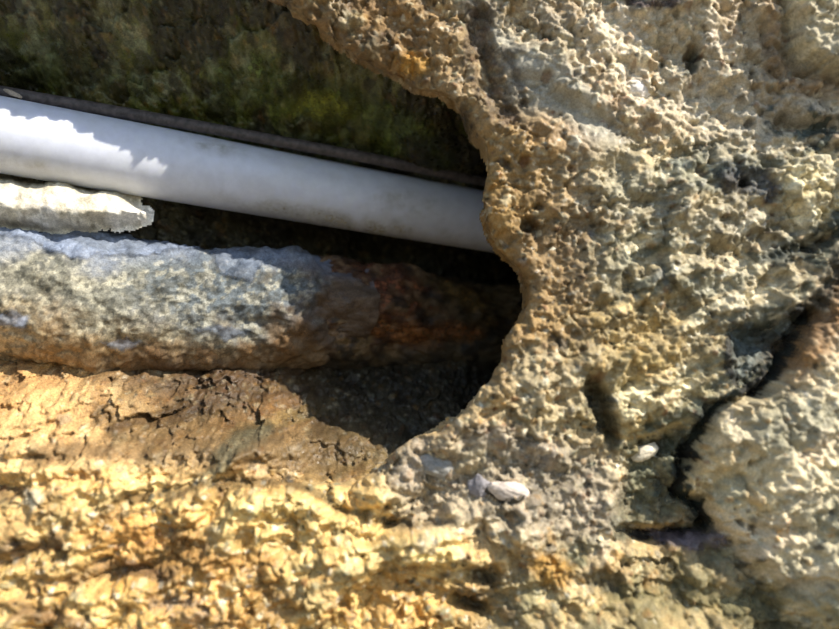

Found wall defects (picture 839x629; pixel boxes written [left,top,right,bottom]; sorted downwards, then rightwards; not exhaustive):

spalling [0,0,487,190]
crack [762,106,839,155]
spalling [0,197,520,286]
peeling [0,310,28,329]
peeling [105,338,140,351]
peeling [195,325,248,342]
crack [616,210,839,593]
spalling [0,359,630,538]